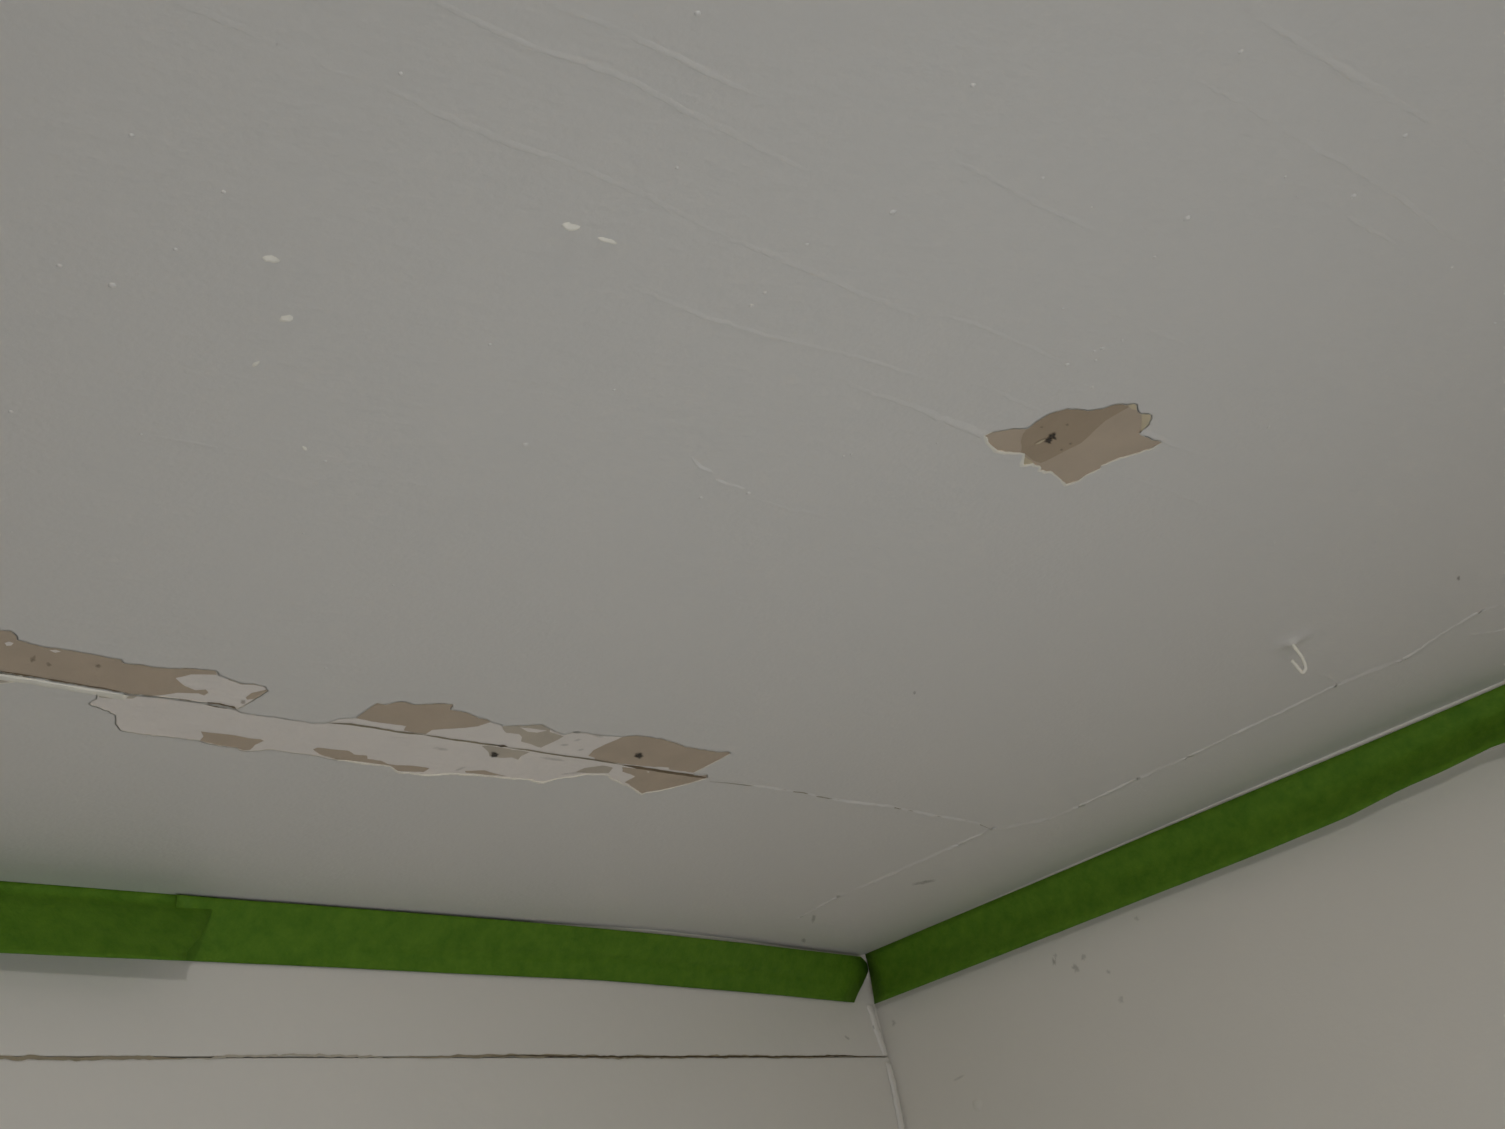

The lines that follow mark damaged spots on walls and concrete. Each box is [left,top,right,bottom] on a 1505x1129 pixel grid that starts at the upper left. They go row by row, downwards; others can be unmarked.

peeling [984,403,1162,487]
peeling [0,630,731,795]